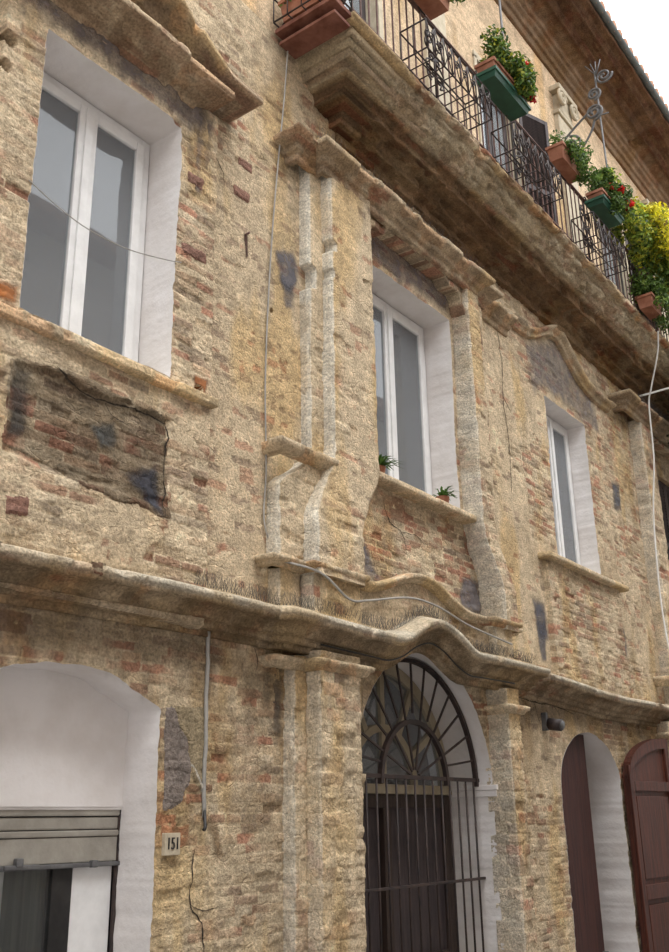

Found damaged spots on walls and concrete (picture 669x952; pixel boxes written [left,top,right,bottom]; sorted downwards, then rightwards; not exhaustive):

spalling [1,358,171,519]
crack [57,366,169,516]
crack [189,849,217,952]